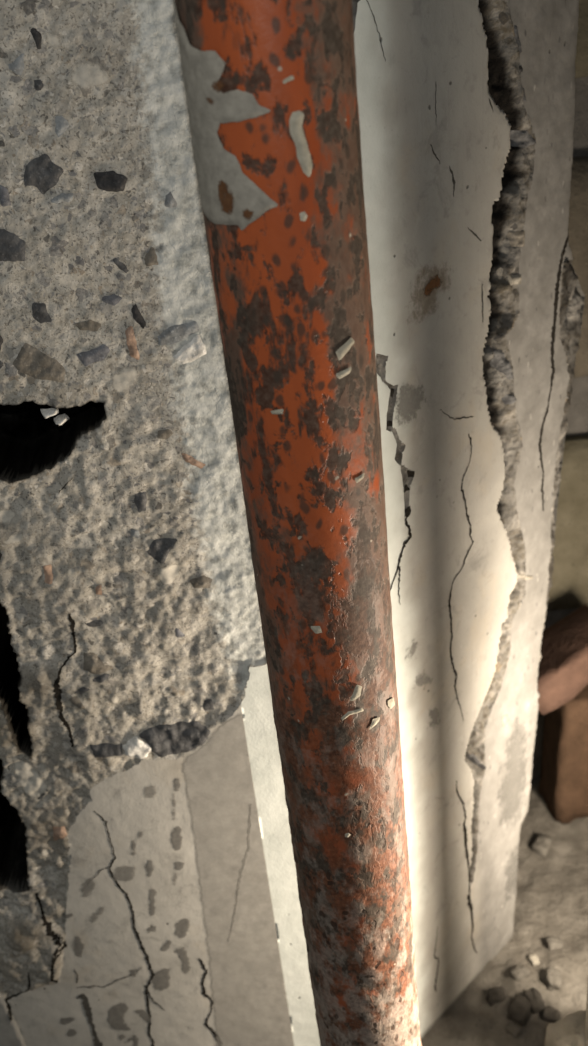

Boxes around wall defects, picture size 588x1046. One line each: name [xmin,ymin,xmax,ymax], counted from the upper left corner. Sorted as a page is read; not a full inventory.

crack [352,0,386,62]
rust [218,180,253,220]
rust [423,270,444,313]
spalling [0,0,267,999]
crack [440,0,569,953]
crack [0,603,165,1046]
flaking render [107,1003,150,1046]
crack [199,958,222,1046]